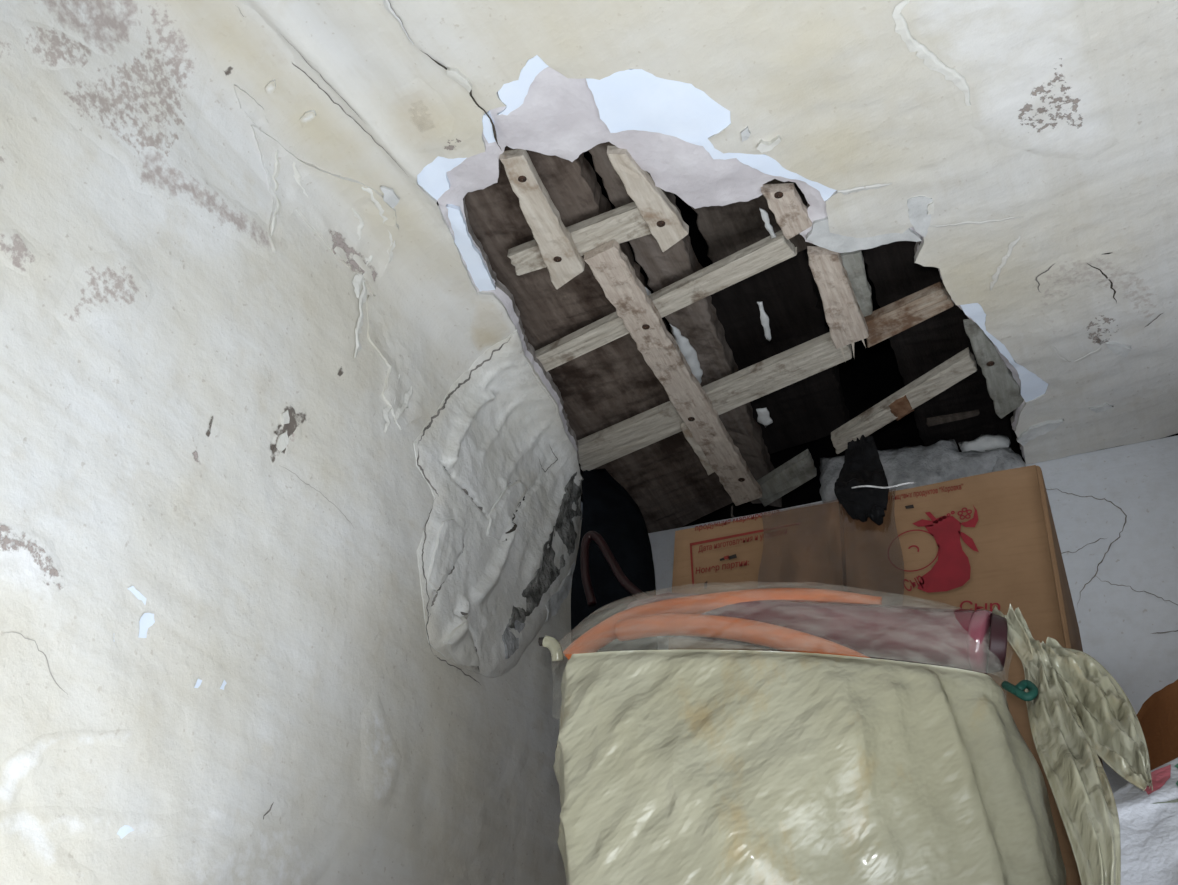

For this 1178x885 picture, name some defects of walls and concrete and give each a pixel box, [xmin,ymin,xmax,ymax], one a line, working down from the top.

crack [288,42,407,175]
crack [383,0,502,151]
water stain [1018,58,1083,132]
spalling [269,401,308,466]
spalling [417,55,924,659]
spalling [878,298,1064,491]
crack [1046,489,1178,634]